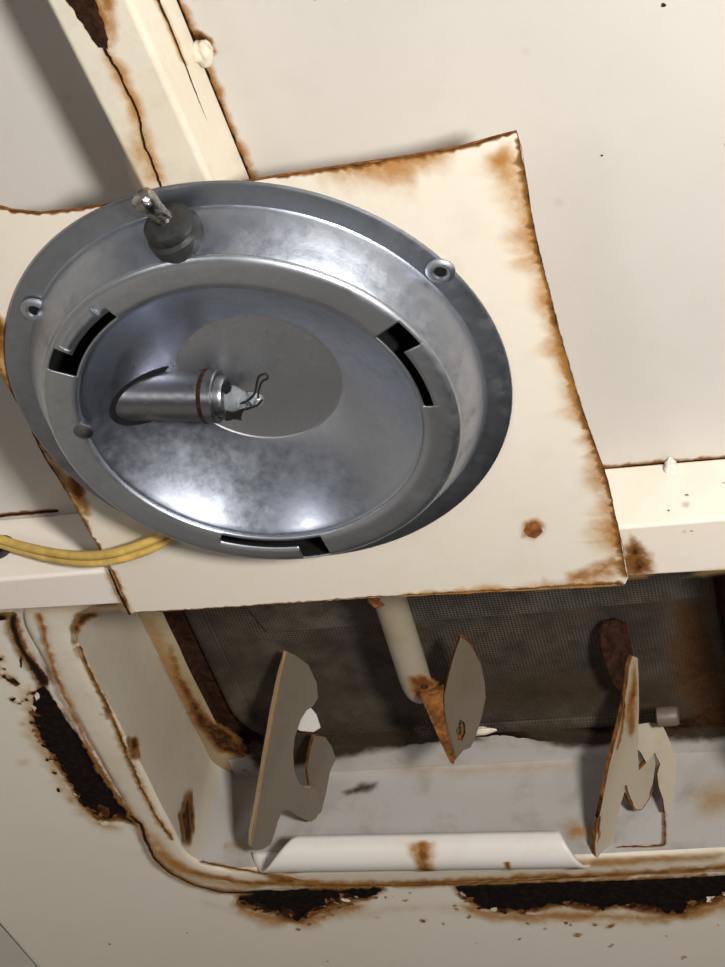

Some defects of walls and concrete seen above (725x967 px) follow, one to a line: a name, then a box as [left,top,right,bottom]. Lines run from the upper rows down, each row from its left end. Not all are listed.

corrosion [95,0,113,44]
corrosion [206,67,256,179]
corrosion [0,205,105,215]
corrosion [0,319,17,402]
corrosion [109,133,725,613]
corrosion [30,428,102,550]
corrosion [9,613,140,827]
corrosion [72,612,725,935]